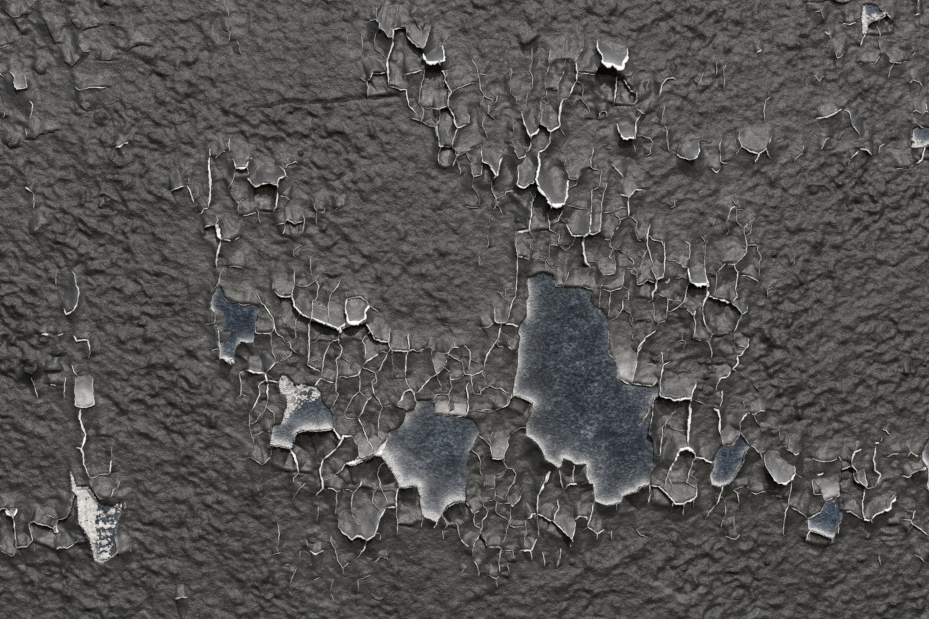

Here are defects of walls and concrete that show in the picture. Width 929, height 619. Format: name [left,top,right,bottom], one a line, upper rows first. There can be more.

crack [223,0,241,55]
crack [241,97,392,115]
crack [470,47,540,120]
crack [643,59,727,148]
crack [753,44,768,68]
crack [757,91,771,123]
crack [798,29,811,39]
crack [472,229,577,297]
flaking render [167,0,929,600]
peeling [0,261,135,571]
crack [902,510,929,576]